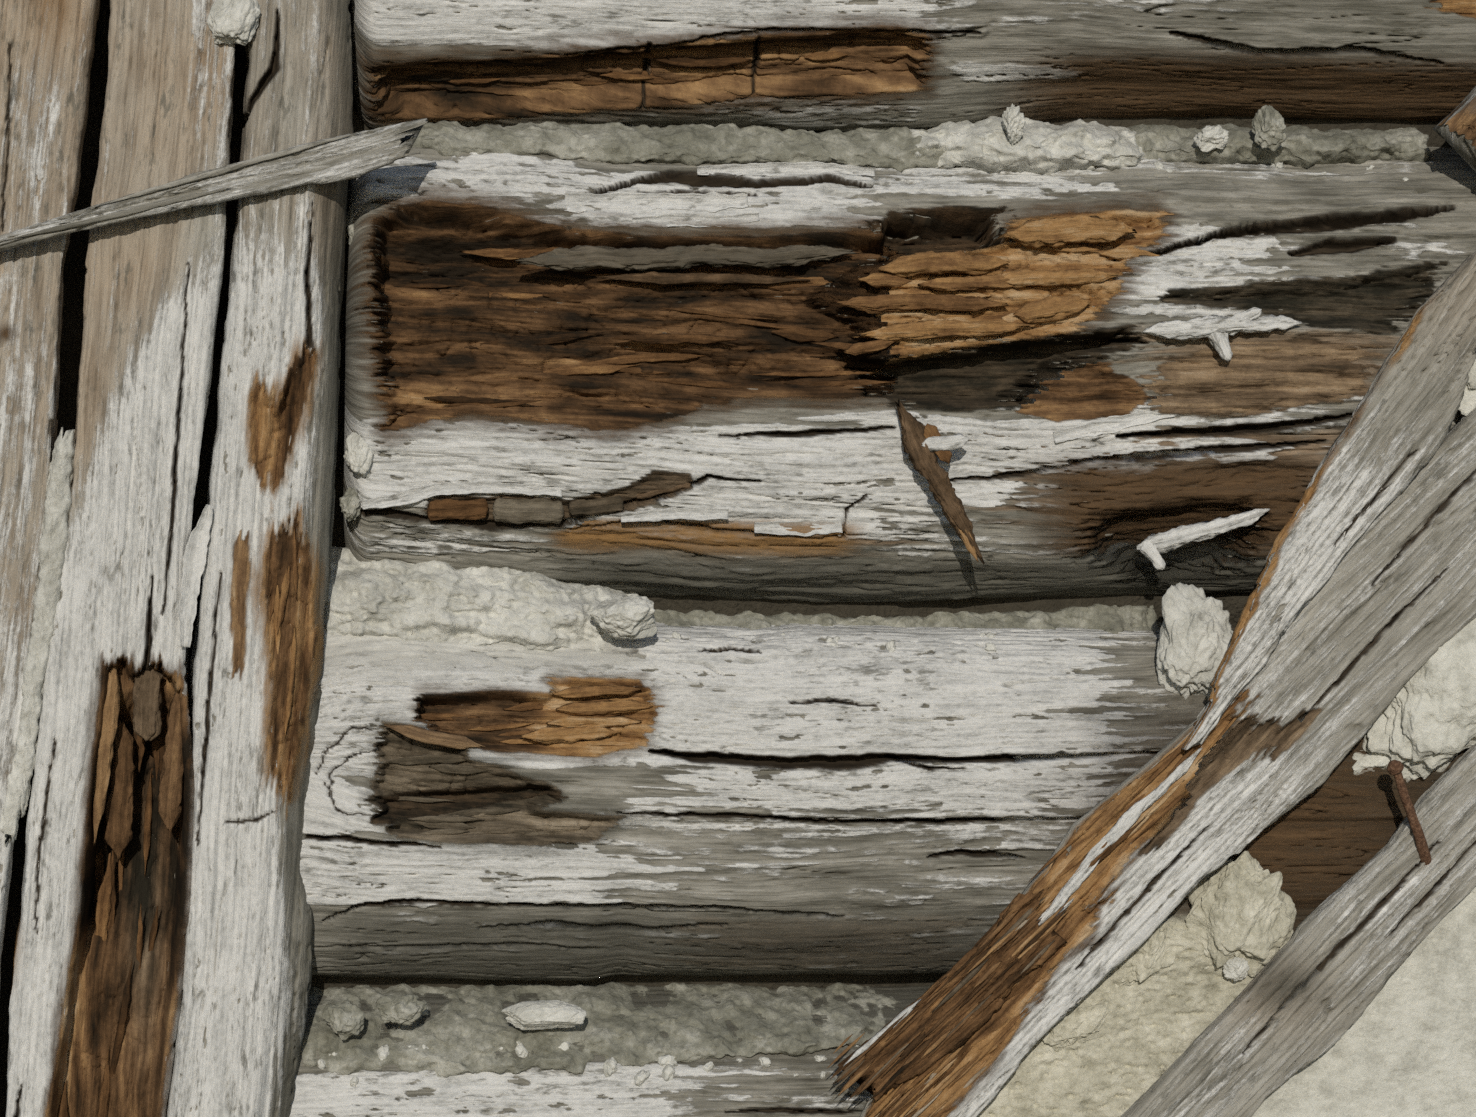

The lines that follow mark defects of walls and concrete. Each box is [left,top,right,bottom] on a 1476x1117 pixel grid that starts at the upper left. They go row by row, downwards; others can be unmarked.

crack [244,9,280,121]
crack [1139,205,1454,257]
spalling [351,161,1178,439]
crack [719,426,896,437]
crack [143,263,190,671]
crack [343,480,581,531]
crack [693,474,760,485]
crack [845,493,867,518]
spalling [365,677,664,846]
crack [649,749,1018,771]
spalling [45,504,213,1117]